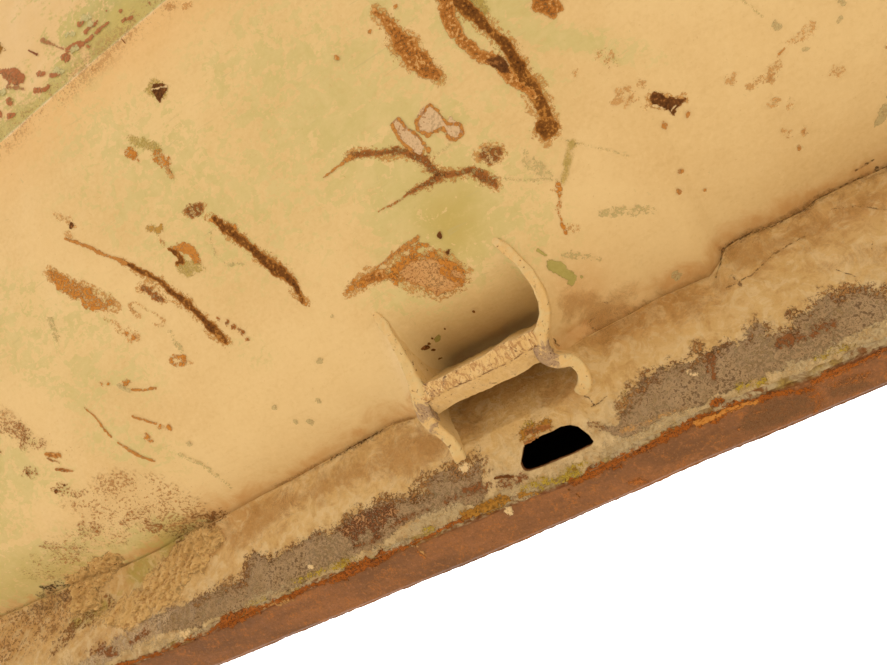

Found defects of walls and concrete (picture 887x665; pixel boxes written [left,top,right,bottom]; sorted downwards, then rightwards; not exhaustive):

corrosion [368,3,447,88]
peeling [390,103,465,155]
corrosion [472,142,508,166]
corrosion [435,0,564,148]
corrosion [43,213,250,345]
corrosion [183,202,310,307]
corrosion [342,232,474,302]
crack [715,159,887,288]
corrosion [494,472,528,490]
corrosion [565,346,887,498]
corrosion [0,472,227,664]
corrosion [115,512,476,665]